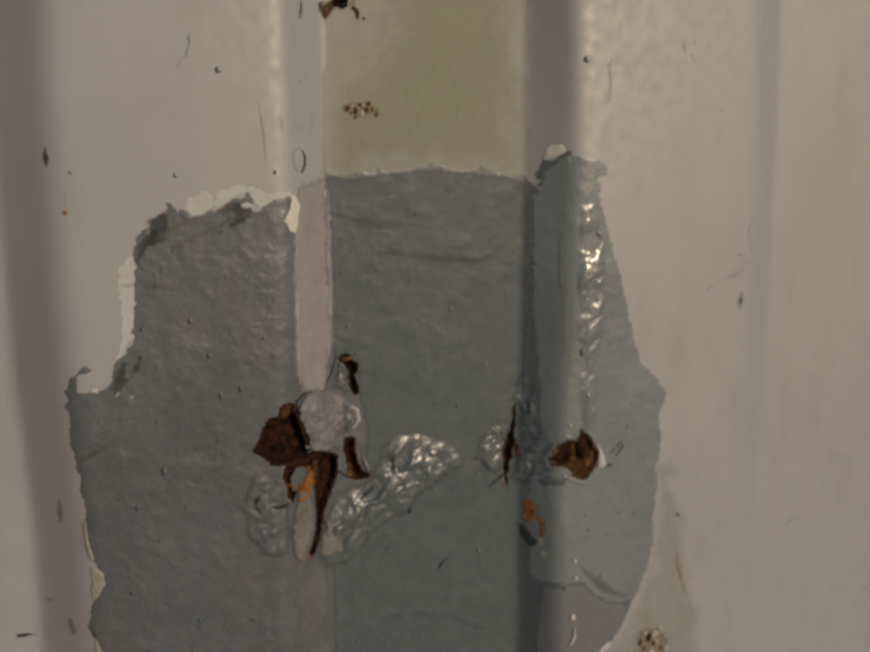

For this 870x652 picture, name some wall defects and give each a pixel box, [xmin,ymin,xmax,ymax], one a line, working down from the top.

rust [318,0,365,20]
rust [345,101,378,119]
peeling [185,184,300,233]
peeling [115,257,137,362]
rust [279,405,322,502]
peeling [83,521,104,602]